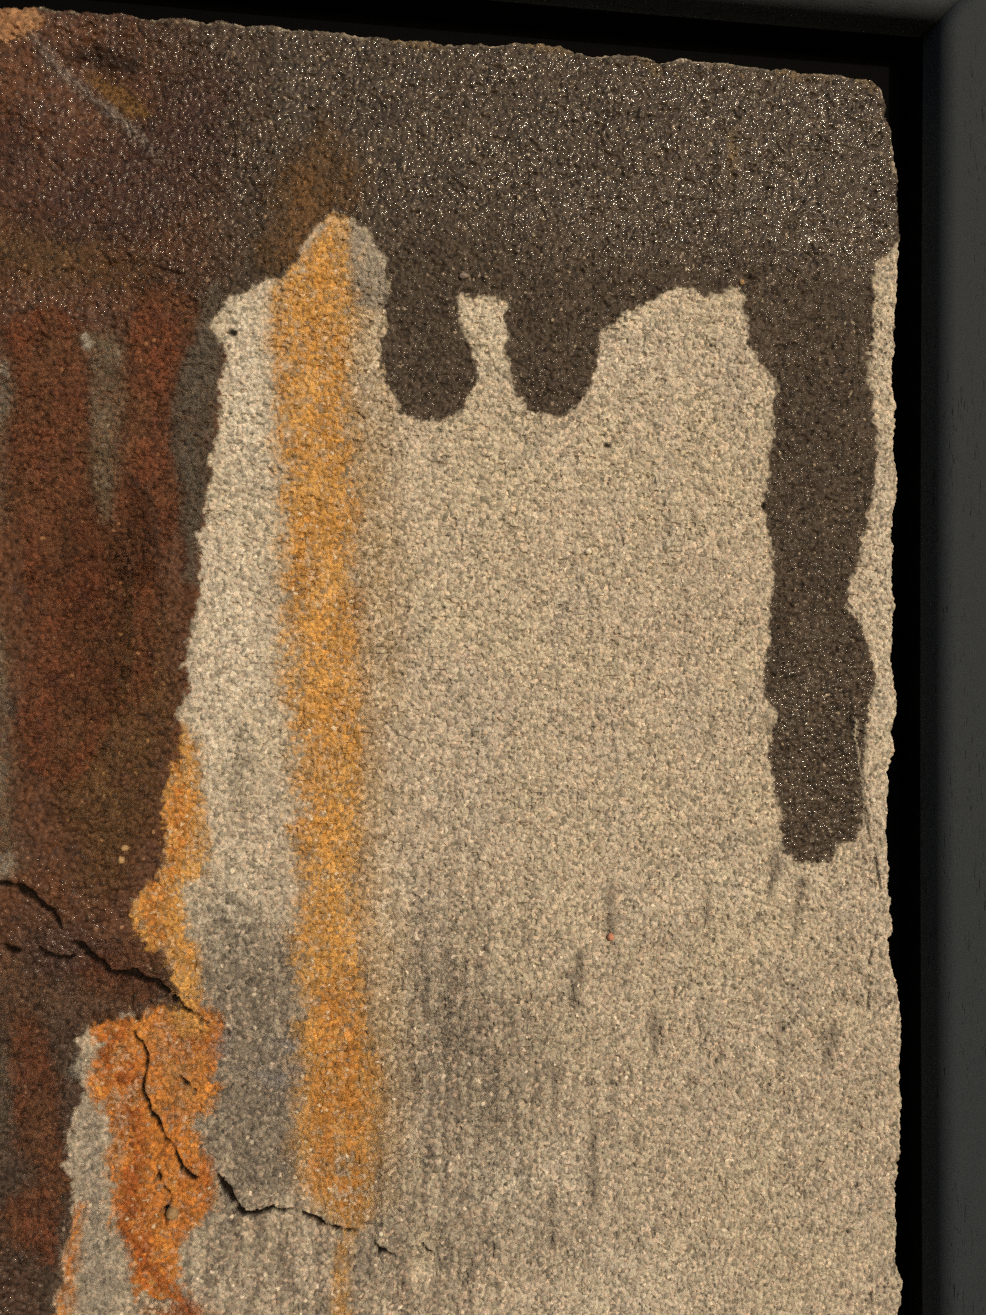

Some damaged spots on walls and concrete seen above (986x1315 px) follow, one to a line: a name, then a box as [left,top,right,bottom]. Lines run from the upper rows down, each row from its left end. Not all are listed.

leakage [82,333,112,388]
corrosion [0,9,228,1315]
crack [0,881,393,1254]
corrosion [260,130,378,1315]
leakage [104,13,900,937]